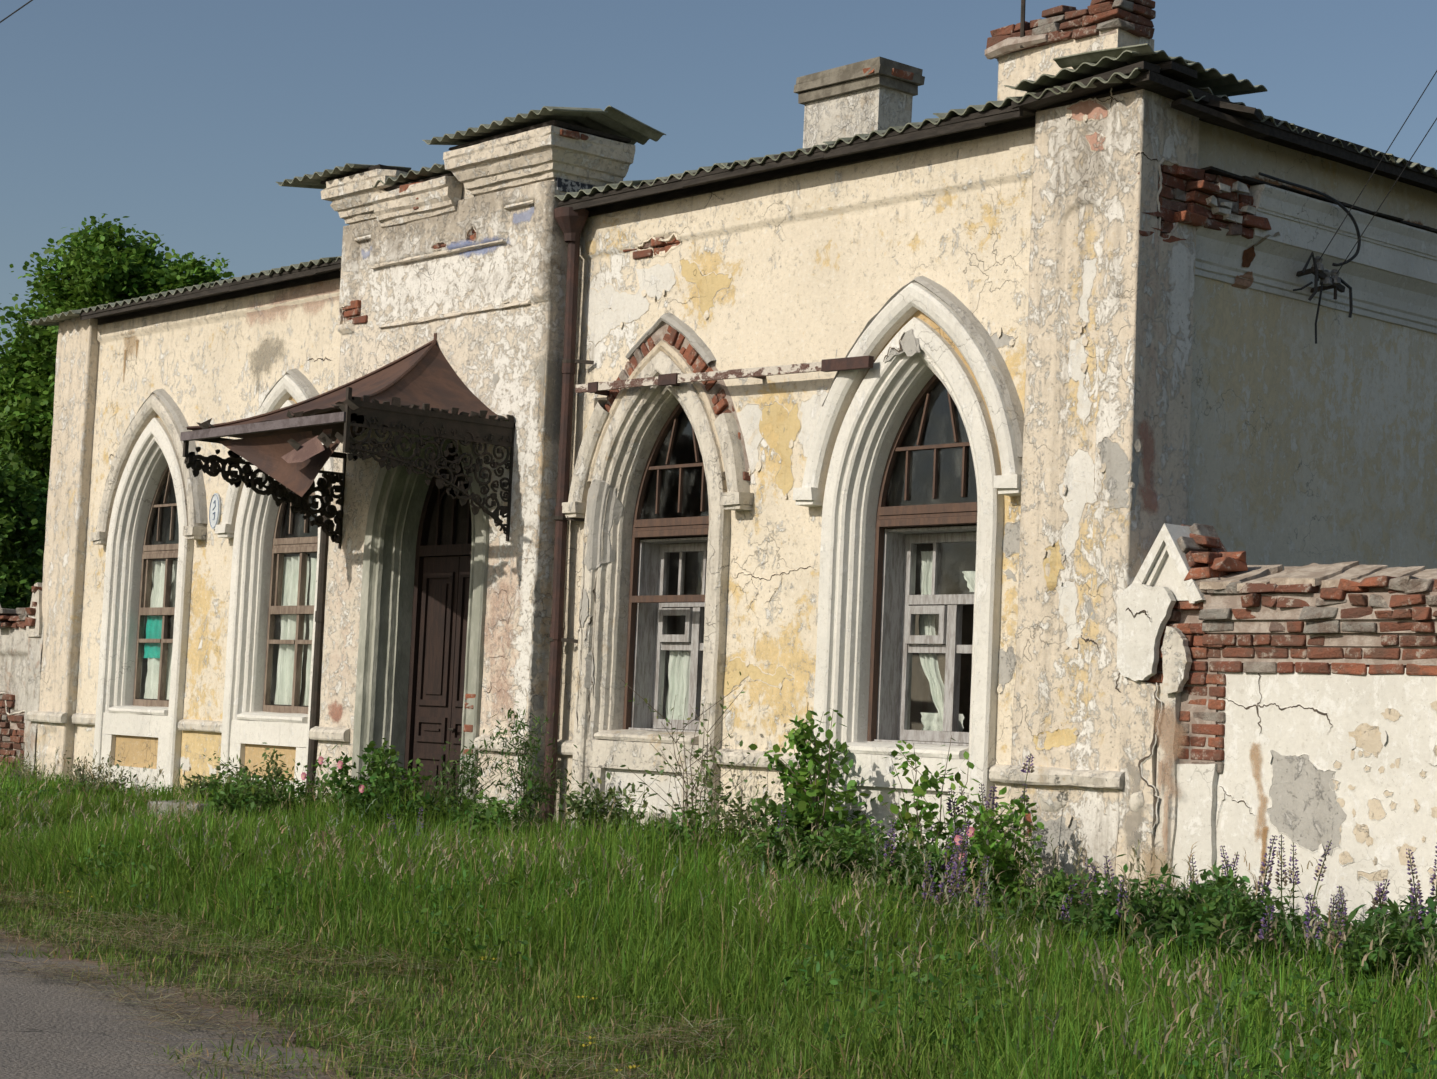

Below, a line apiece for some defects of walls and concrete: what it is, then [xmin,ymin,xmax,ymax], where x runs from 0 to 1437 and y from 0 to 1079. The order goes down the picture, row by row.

flaking render [1139,158,1272,243]
flaking render [339,300,368,326]
peeling [1067,257,1098,429]
flaking render [582,233,828,572]
crack [732,565,817,612]
flaking render [1001,520,1020,583]
flaking render [1041,436,1141,651]
flaking render [0,692,25,769]
flaking render [997,644,1016,695]
crack [1065,607,1162,835]
crack [1221,673,1334,735]
flaking render [1266,707,1437,901]